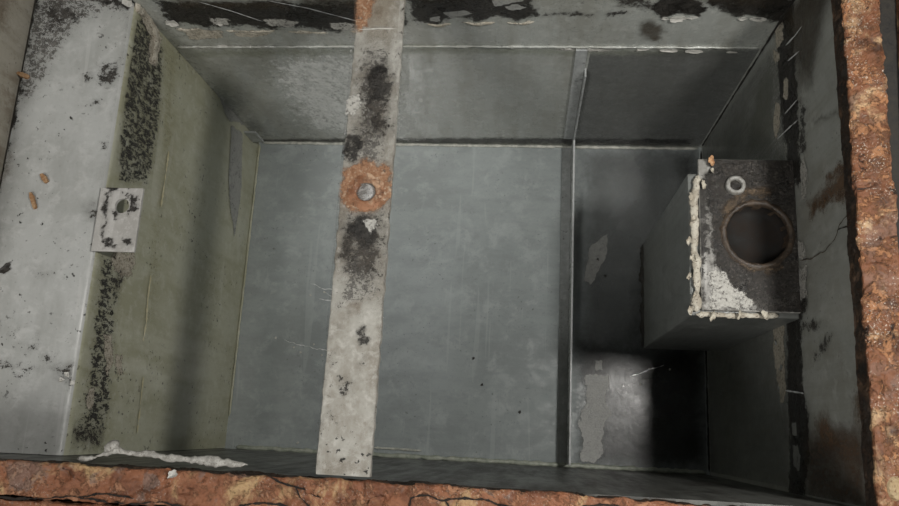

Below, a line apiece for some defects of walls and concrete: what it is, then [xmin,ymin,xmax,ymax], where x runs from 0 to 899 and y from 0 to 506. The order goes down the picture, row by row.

rust [355,0,374,32]
water stain [607,0,653,17]
water stain [260,50,417,162]
rust [340,158,392,212]
water stain [338,215,385,282]
peeling [584,234,608,285]
peeling [707,269,769,321]
peeling [773,325,786,403]
peeling [578,360,611,463]
crack [0,493,182,506]
crack [239,476,320,506]
crack [409,494,509,506]